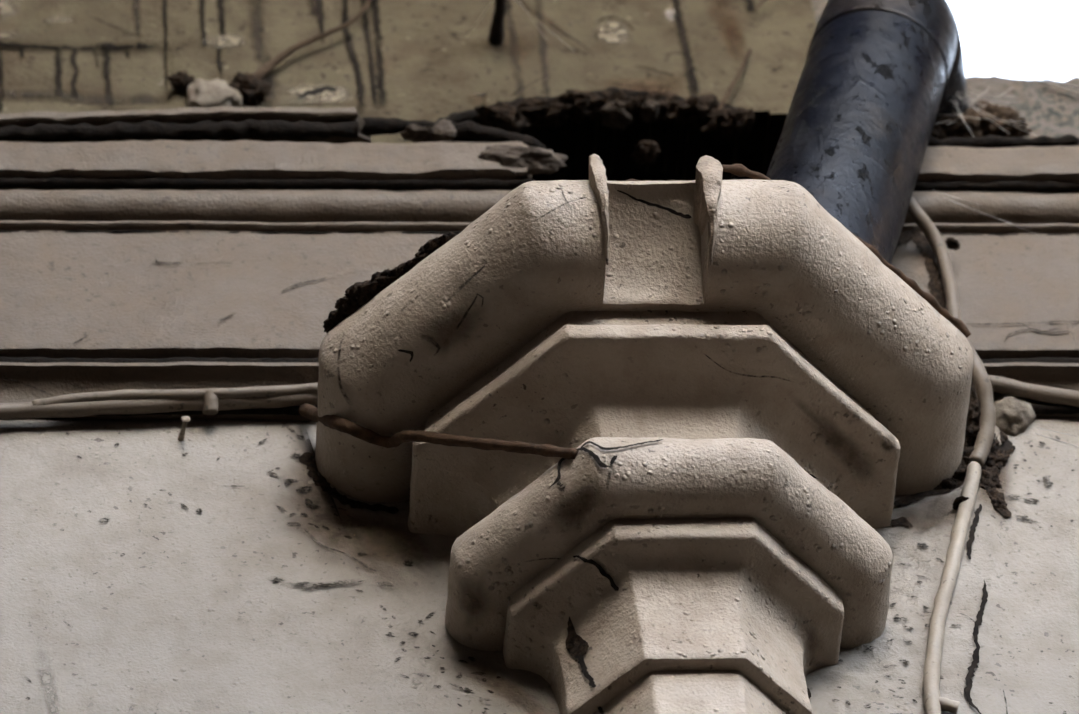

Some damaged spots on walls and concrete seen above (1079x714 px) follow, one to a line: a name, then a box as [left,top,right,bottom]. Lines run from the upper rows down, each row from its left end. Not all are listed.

crack [617,190,692,219]
spalling [978,440,1038,523]
crack [532,555,627,591]
crack [960,504,1008,714]
crack [565,617,605,714]